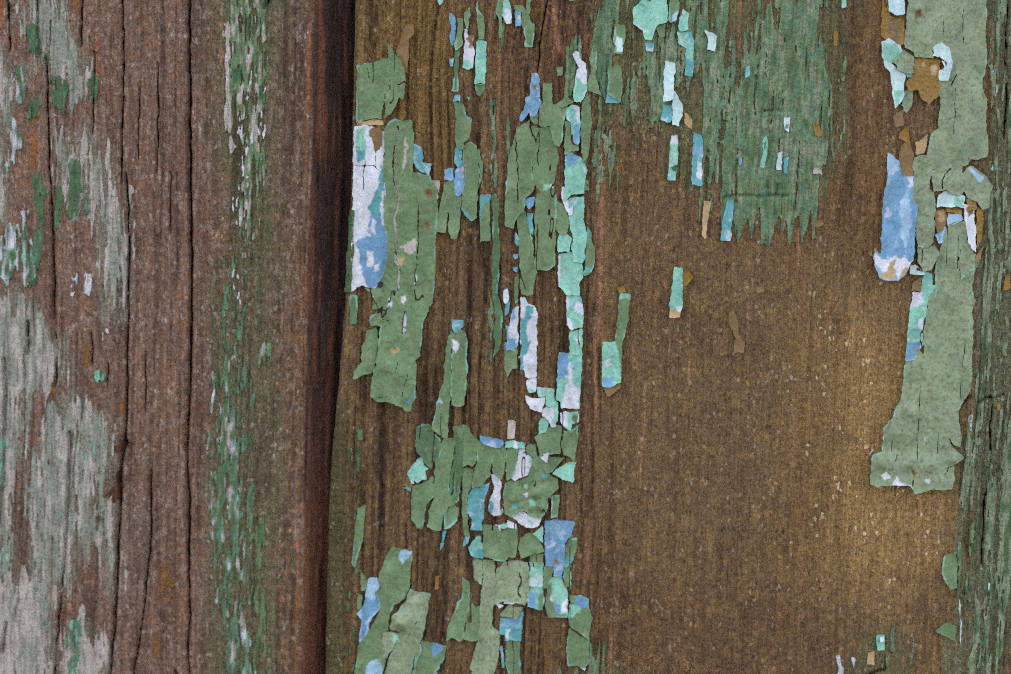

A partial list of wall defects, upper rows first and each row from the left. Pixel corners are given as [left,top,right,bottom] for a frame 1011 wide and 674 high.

peeling [0,0,136,674]
crack [78,0,86,41]
crack [92,0,194,674]
peeling [344,0,847,674]
peeling [836,624,895,674]
peeling [870,0,1011,674]